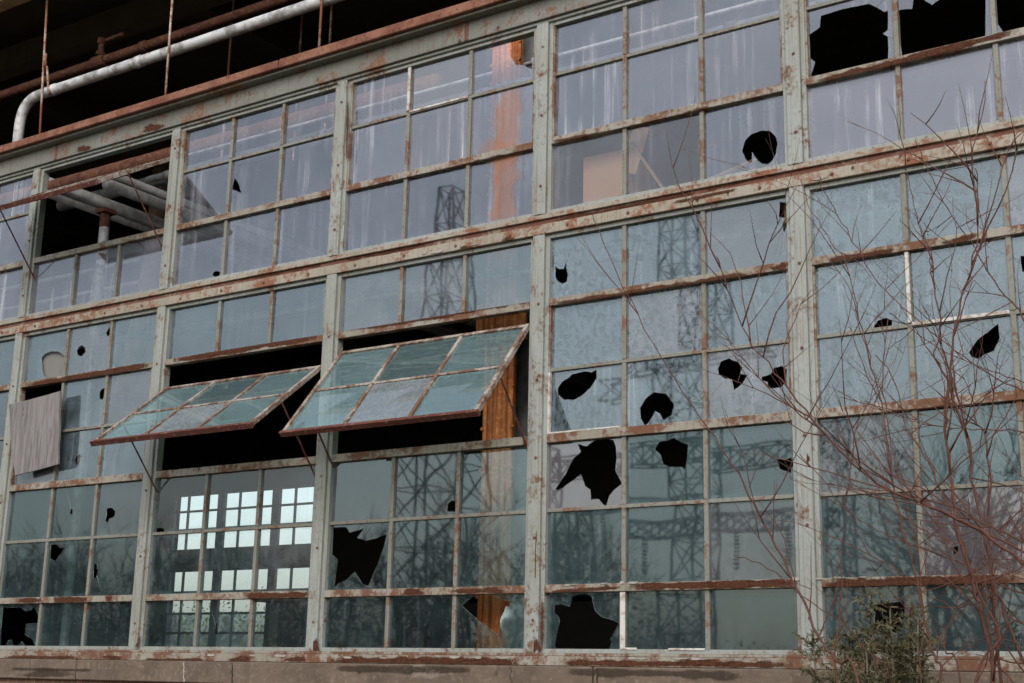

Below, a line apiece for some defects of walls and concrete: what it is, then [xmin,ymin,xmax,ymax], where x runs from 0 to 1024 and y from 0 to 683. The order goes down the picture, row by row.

rust [557,174,779,222]
rust [347,244,425,261]
rust [631,579,791,590]
rust [827,575,1013,587]
rust [285,639,319,661]
rust [567,659,784,668]